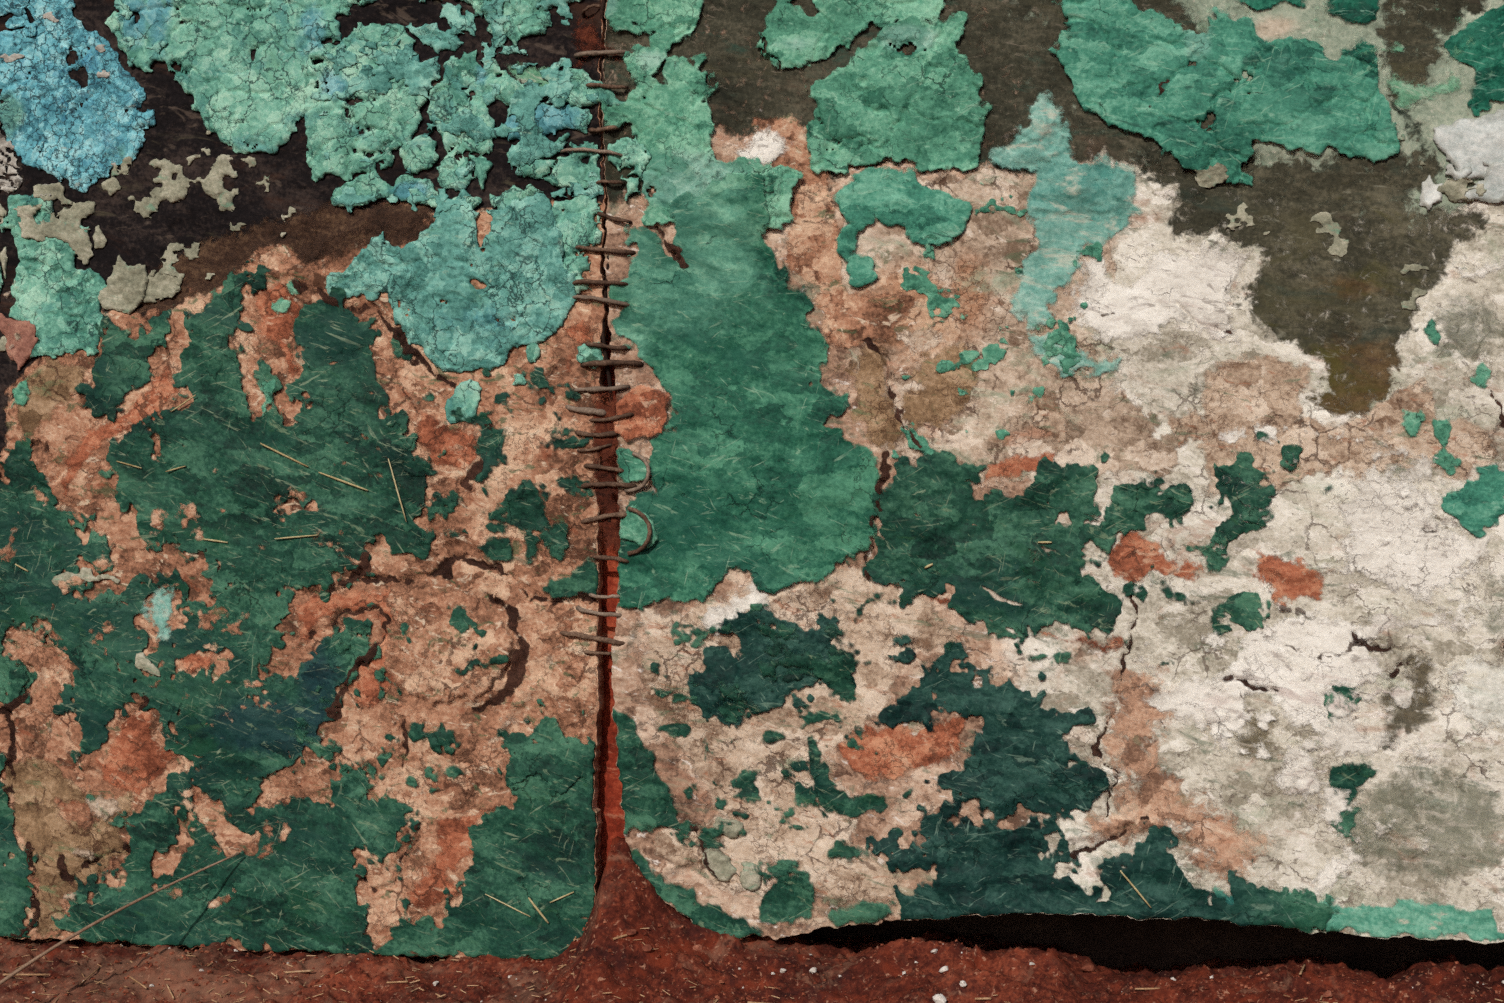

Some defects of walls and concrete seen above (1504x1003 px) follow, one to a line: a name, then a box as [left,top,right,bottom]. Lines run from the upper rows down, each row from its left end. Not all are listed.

rust [573,16,621,67]
damp [1168,388,1238,454]
rust [591,392,623,551]
crack [308,552,596,720]
peeling [448,605,487,650]
peeling [1201,552,1331,652]
damp [1237,713,1277,756]
peeling [1320,678,1422,731]
damp [1381,654,1432,750]
peeling [1291,740,1396,842]
damp [1312,771,1504,895]
peeling [631,848,762,939]